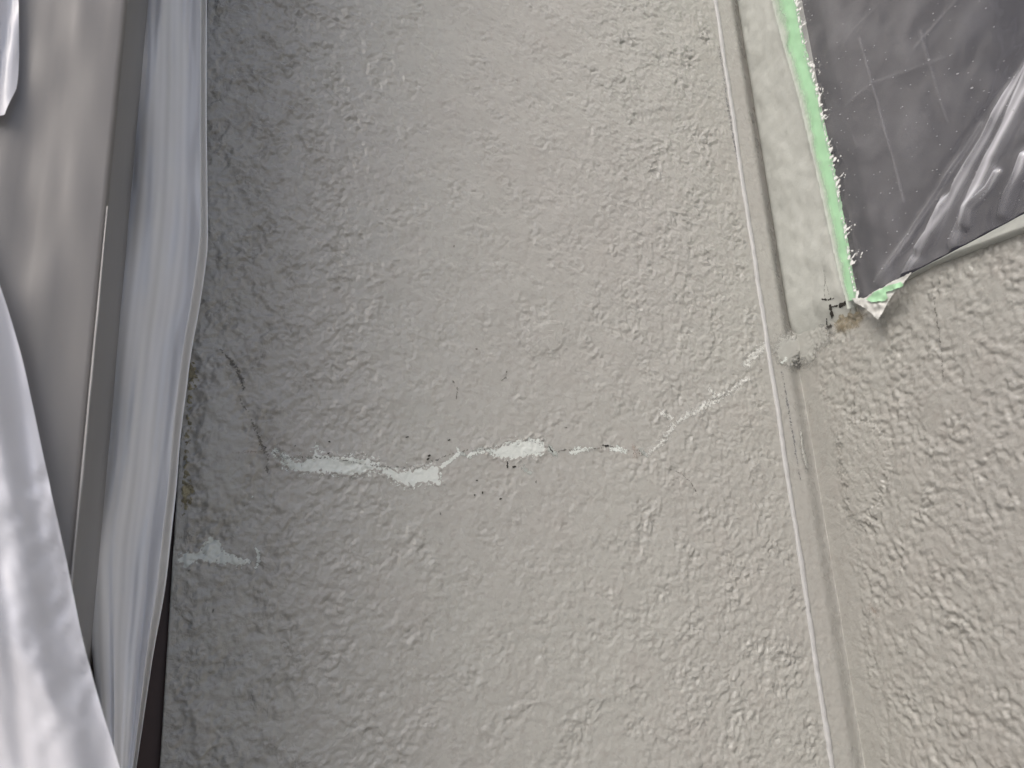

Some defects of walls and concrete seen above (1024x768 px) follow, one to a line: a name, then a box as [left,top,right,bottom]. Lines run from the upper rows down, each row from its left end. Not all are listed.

crack [639,340,767,456]
peeling [268,432,595,493]
peeling [173,529,261,577]